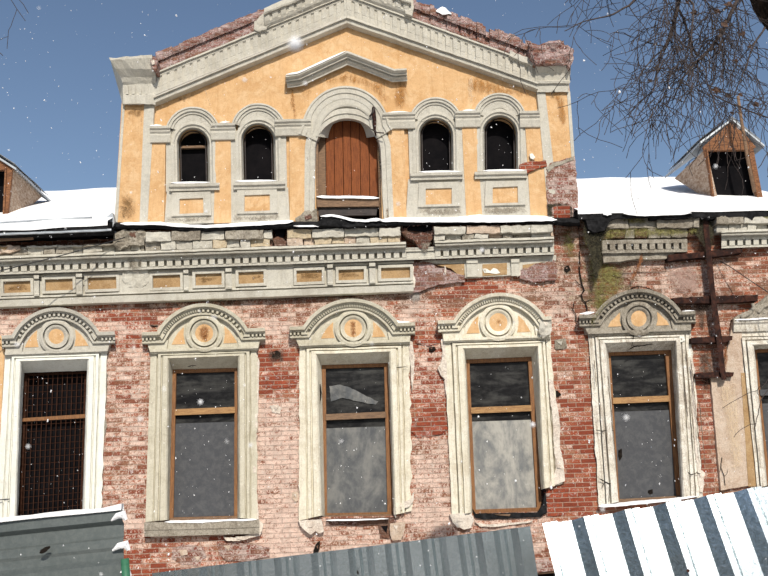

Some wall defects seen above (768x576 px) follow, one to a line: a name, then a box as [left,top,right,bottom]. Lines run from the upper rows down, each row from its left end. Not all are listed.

spalling [519,153,578,218]
spalling [411,261,465,293]
water stain [583,221,610,306]
crack [571,227,662,321]